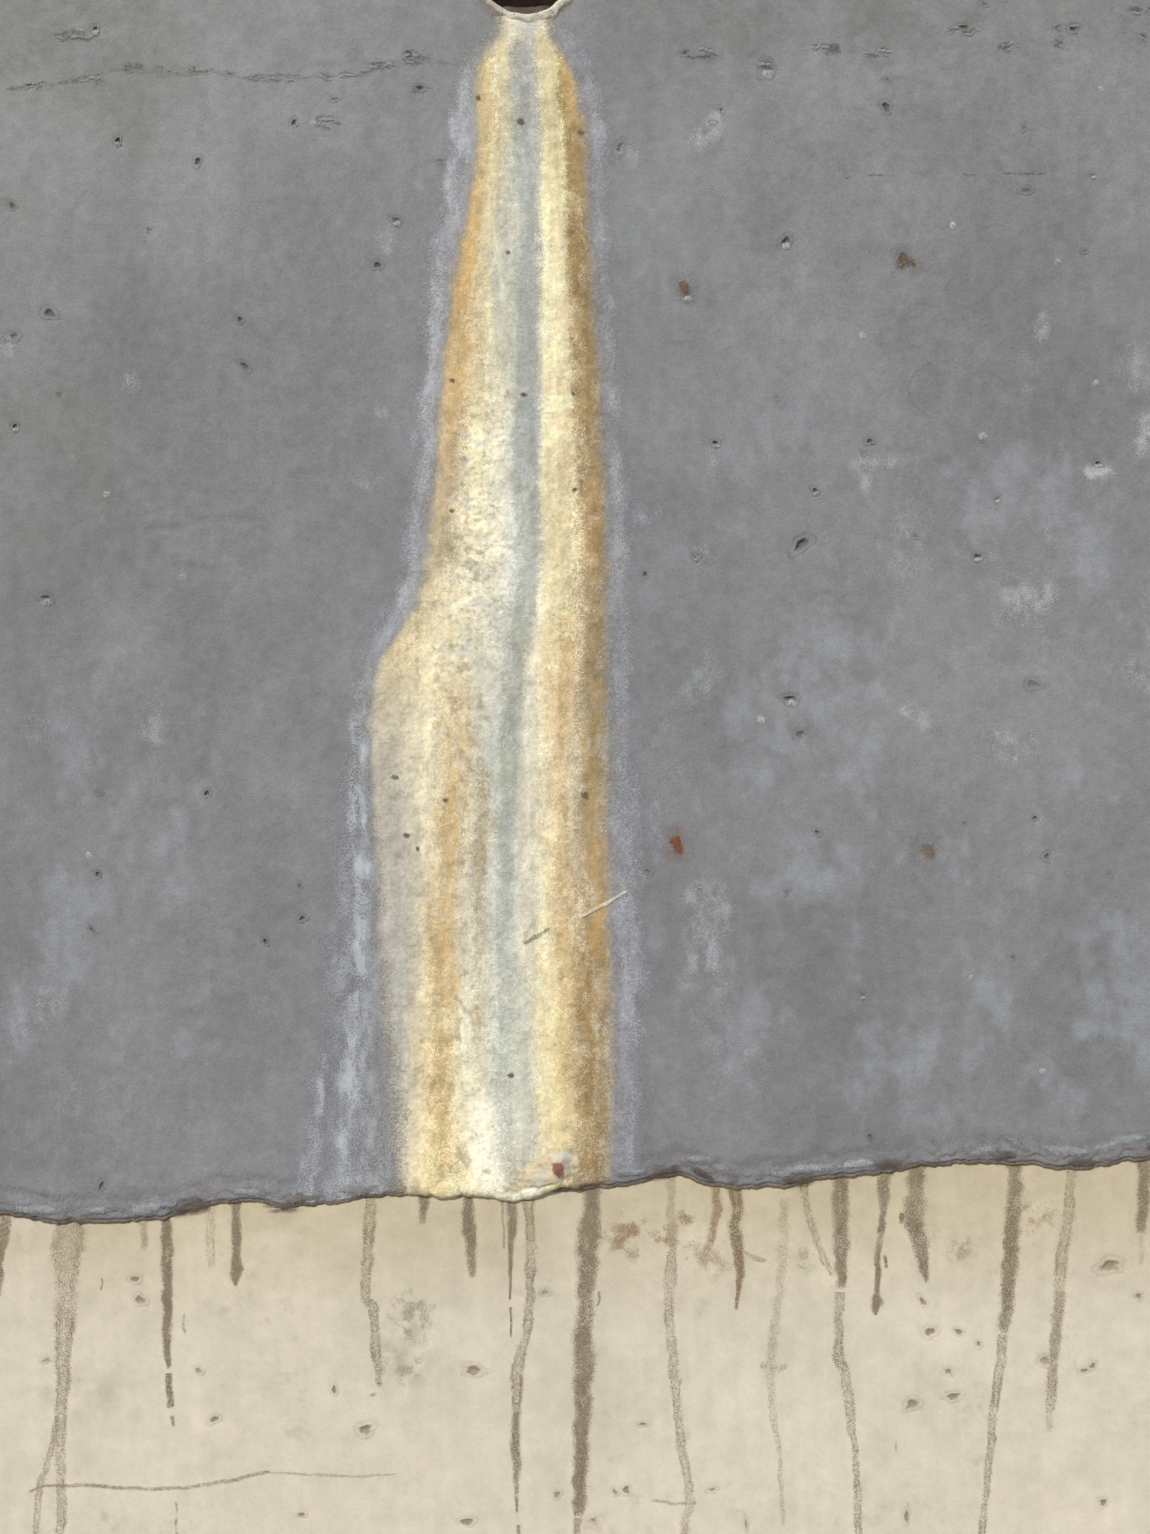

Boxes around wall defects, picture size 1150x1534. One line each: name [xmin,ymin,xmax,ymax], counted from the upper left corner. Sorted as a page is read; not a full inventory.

damp [0,1215,12,1296]
damp [33,1221,87,1534]
damp [139,1217,175,1427]
damp [205,1203,244,1286]
damp [698,1176,863,1534]
damp [871,1165,931,1315]
damp [978,1165,1025,1534]
damp [1045,1169,1077,1429]
damp [1134,1160,1150,1265]
crack [29,1470,397,1534]